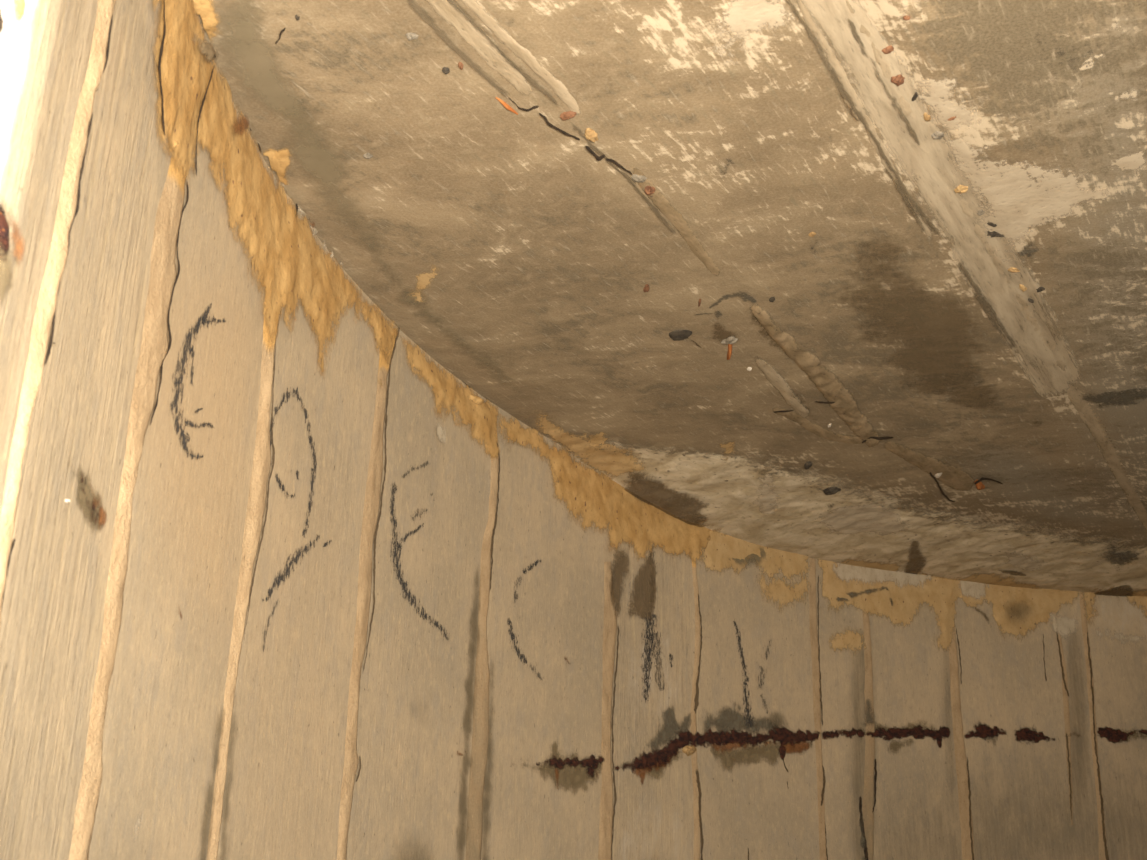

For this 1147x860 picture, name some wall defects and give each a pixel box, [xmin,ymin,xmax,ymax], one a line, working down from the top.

crack [45,3,116,364]
crack [509,98,632,175]
crack [150,56,216,425]
damp [611,551,656,619]
spalling [837,587,893,605]
damp [465,611,477,732]
corrosion [536,706,950,791]
corrosion [965,722,1055,743]
crack [1043,631,1109,860]
corrosion [1097,727,1147,743]
damp [457,751,469,851]
crack [859,759,877,860]